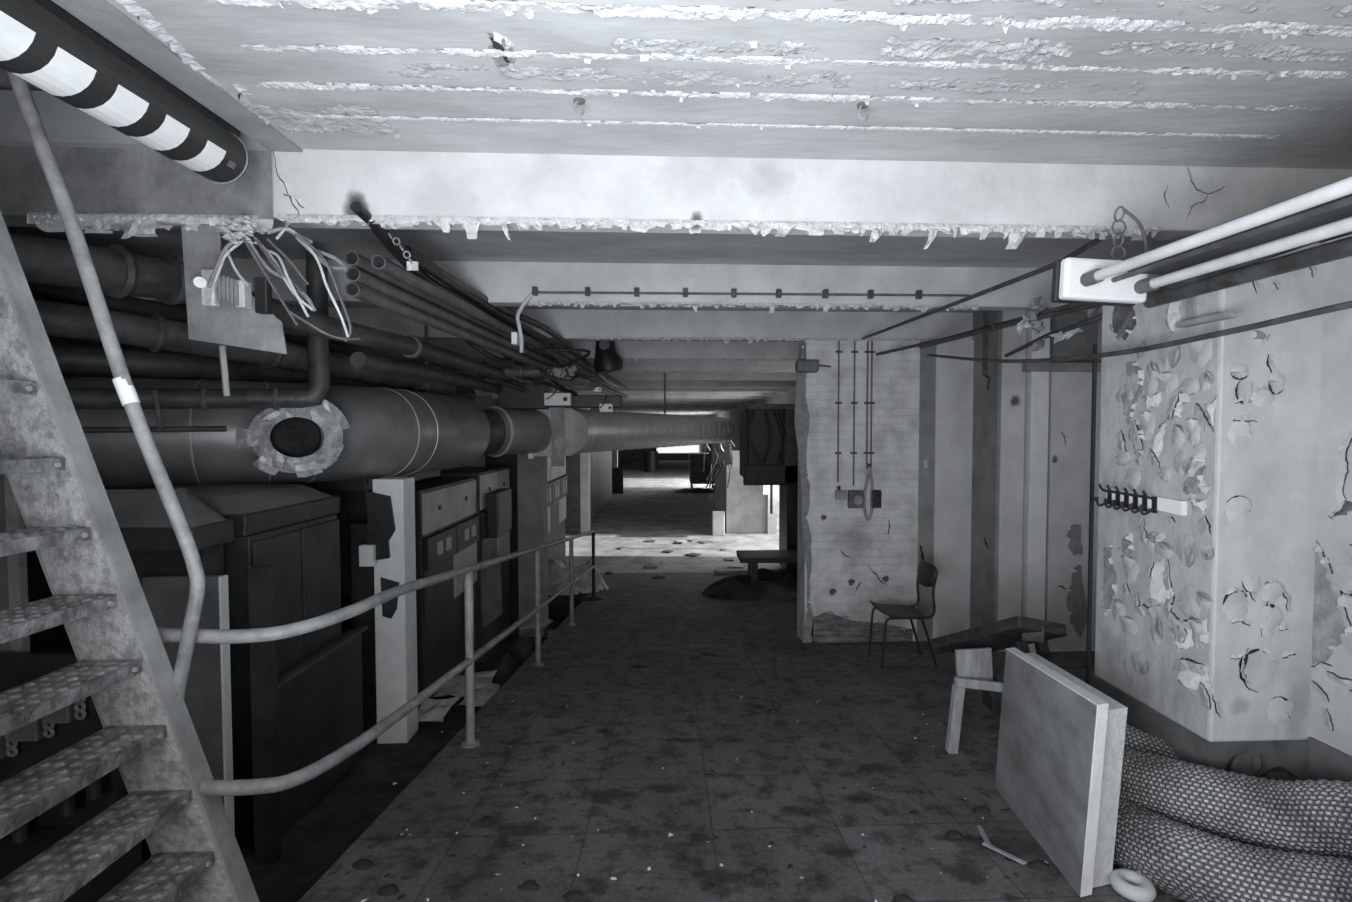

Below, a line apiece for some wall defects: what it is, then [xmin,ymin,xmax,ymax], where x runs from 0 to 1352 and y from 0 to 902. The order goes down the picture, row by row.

peeling [207,0,1352,140]
peeling [27,212,65,232]
peeling [76,213,1162,249]
crack [1164,166,1225,220]
peeling [1110,306,1137,343]
peeling [1163,301,1181,334]
peeling [1123,359,1218,466]
spalling [794,346,916,643]
spalling [1327,499,1352,521]
crack [1335,424,1352,503]
peeling [1064,524,1212,695]
peeling [1312,544,1352,665]